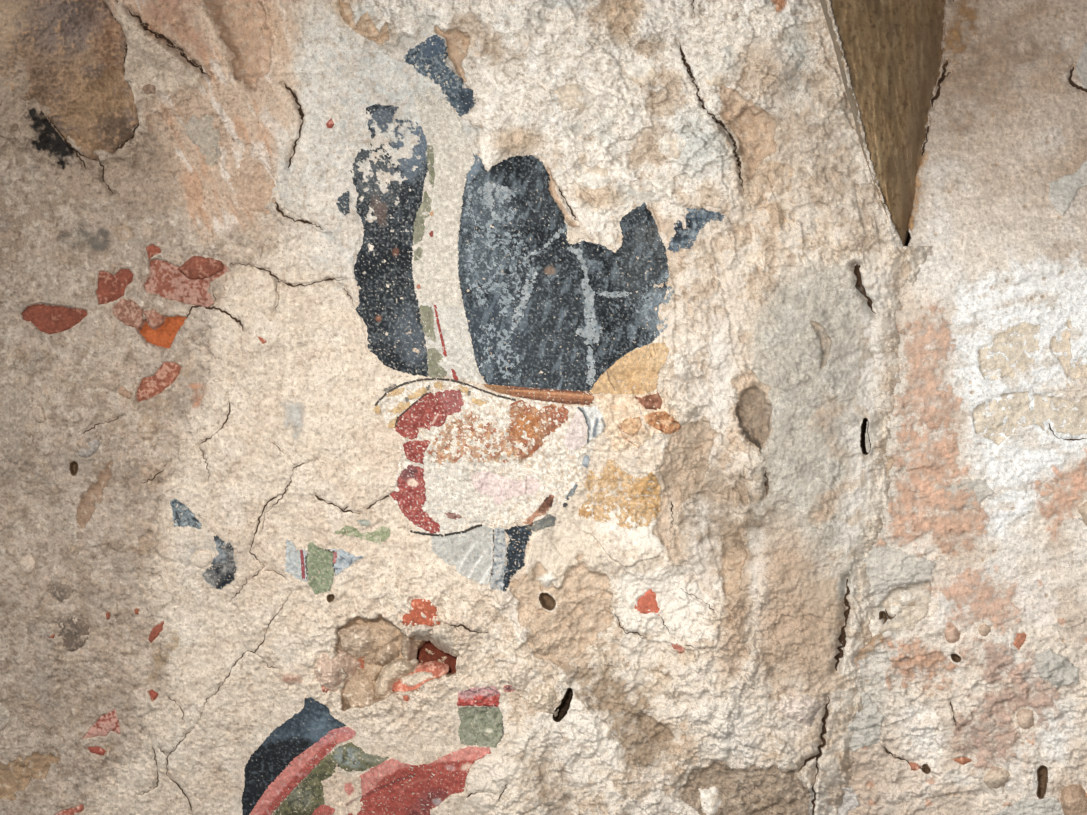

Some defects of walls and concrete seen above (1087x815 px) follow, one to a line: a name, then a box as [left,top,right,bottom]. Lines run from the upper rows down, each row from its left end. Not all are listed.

crack [112,0,210,76]
crack [50,115,139,193]
crack [283,83,304,168]
spalling [324,0,826,251]
crack [679,43,744,193]
crack [275,202,323,230]
crack [187,294,245,332]
crack [231,263,353,310]
spalling [335,615,454,711]
crack [834,579,850,671]
crack [798,697,830,815]